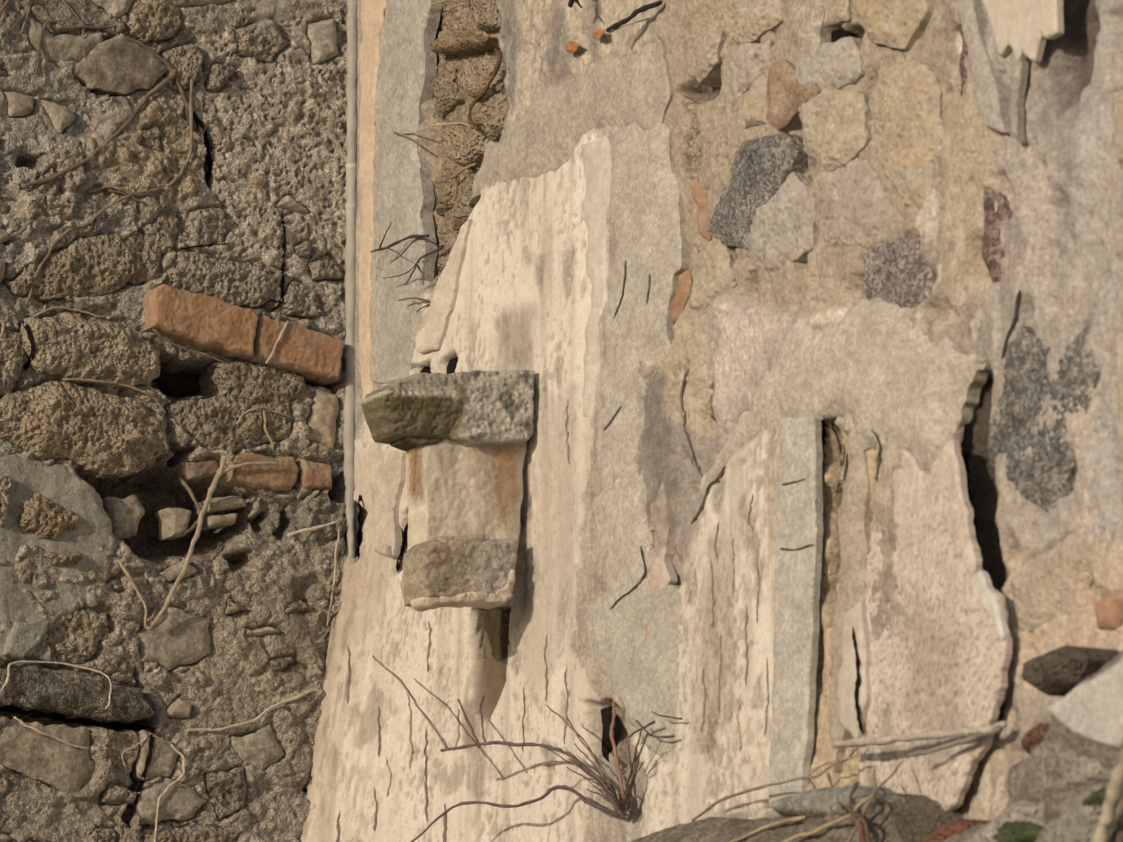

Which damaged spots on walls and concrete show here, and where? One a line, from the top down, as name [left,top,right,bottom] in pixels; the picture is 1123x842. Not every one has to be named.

crack [177,84,212,183]
spalling [419,0,510,354]
peeling [957,0,1064,143]
crack [270,211,286,312]
peeling [368,450,407,557]
peeling [645,478,678,644]
crack [782,416,848,498]
crack [961,407,976,536]
crack [852,627,864,735]
crack [0,702,156,829]
peeling [373,707,391,831]
peeling [407,692,428,819]